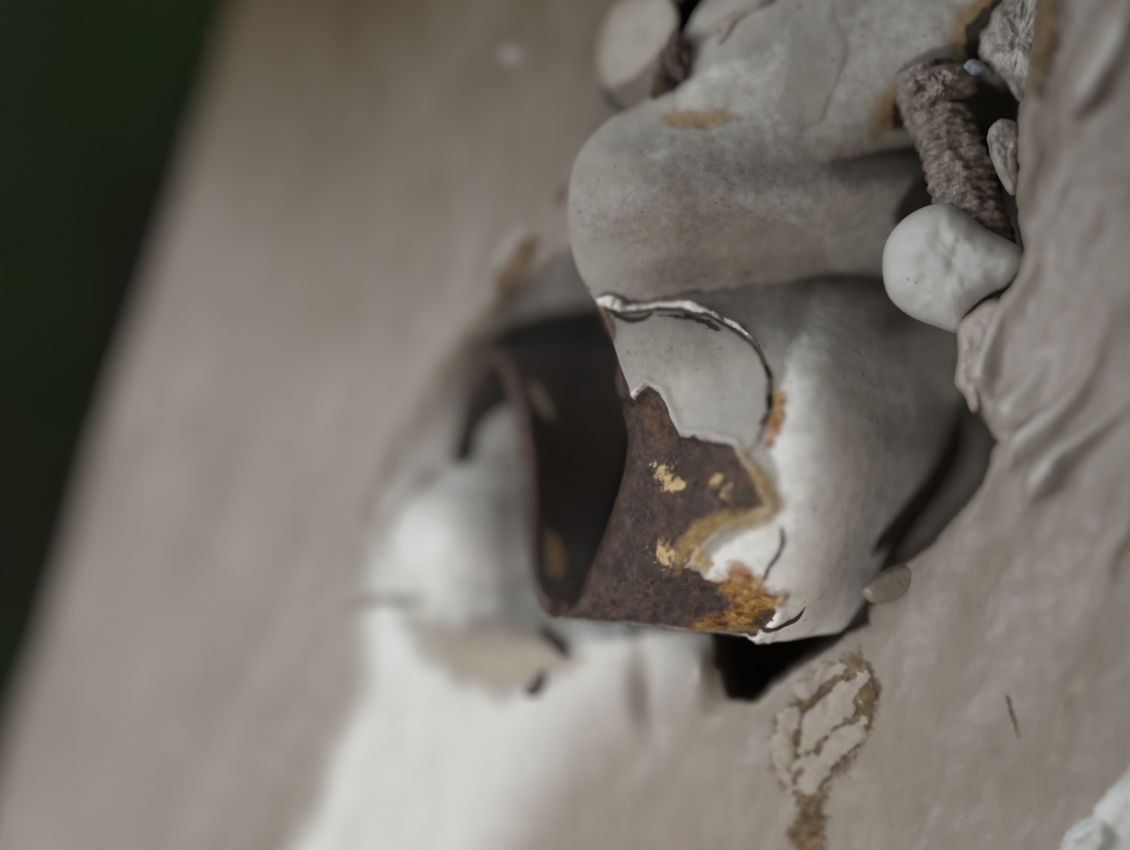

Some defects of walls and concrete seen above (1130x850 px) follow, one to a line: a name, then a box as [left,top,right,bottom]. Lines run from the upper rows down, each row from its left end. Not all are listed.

peeling [597,0,691,113]
peeling [596,295,761,348]
peeling [759,364,773,425]
rust [562,387,787,638]
peeling [768,646,881,850]
peeling [1061,771,1130,850]